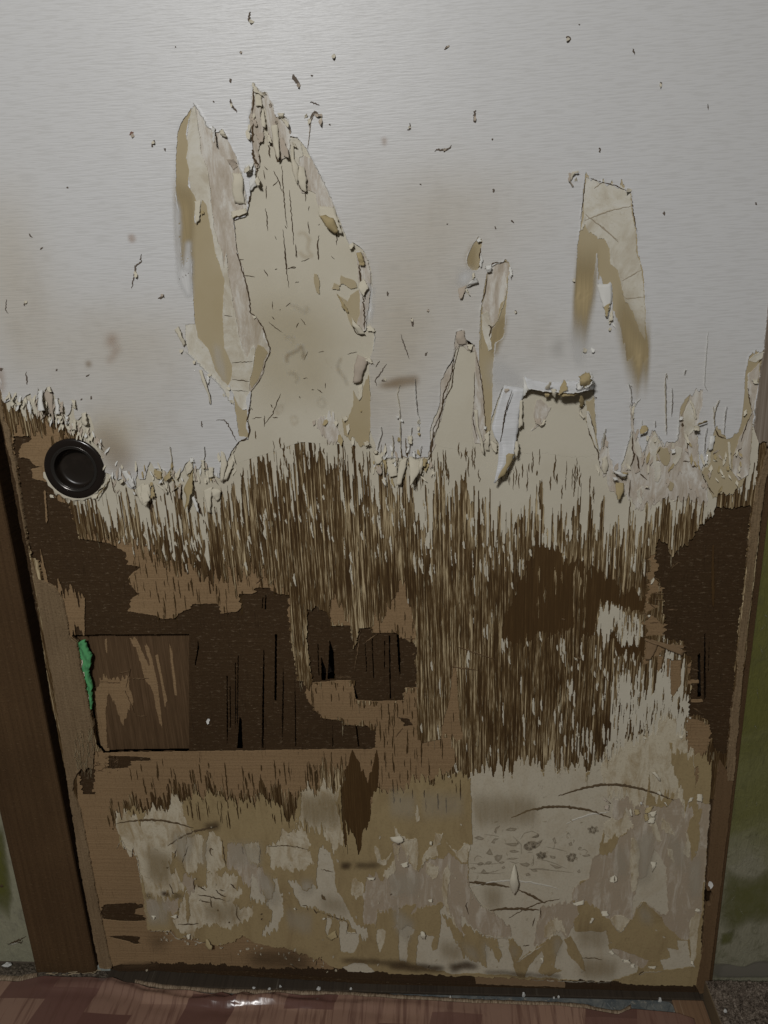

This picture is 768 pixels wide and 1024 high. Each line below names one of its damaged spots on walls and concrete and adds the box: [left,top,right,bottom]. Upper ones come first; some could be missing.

peeling [151,83,387,463]
peeling [428,237,764,511]
peeling [572,173,649,382]
damp [92,674,133,751]
damp [130,637,177,726]